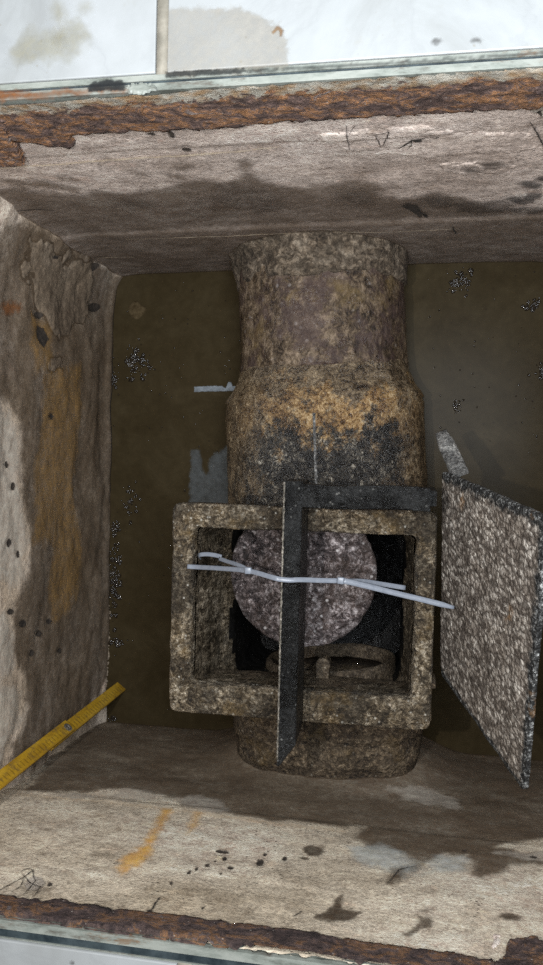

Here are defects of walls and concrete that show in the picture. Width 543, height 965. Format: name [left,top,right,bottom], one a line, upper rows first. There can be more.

leakage [0,165,543,759]
leakage [26,721,543,883]
leakage [315,896,359,921]
leakage [409,918,431,935]